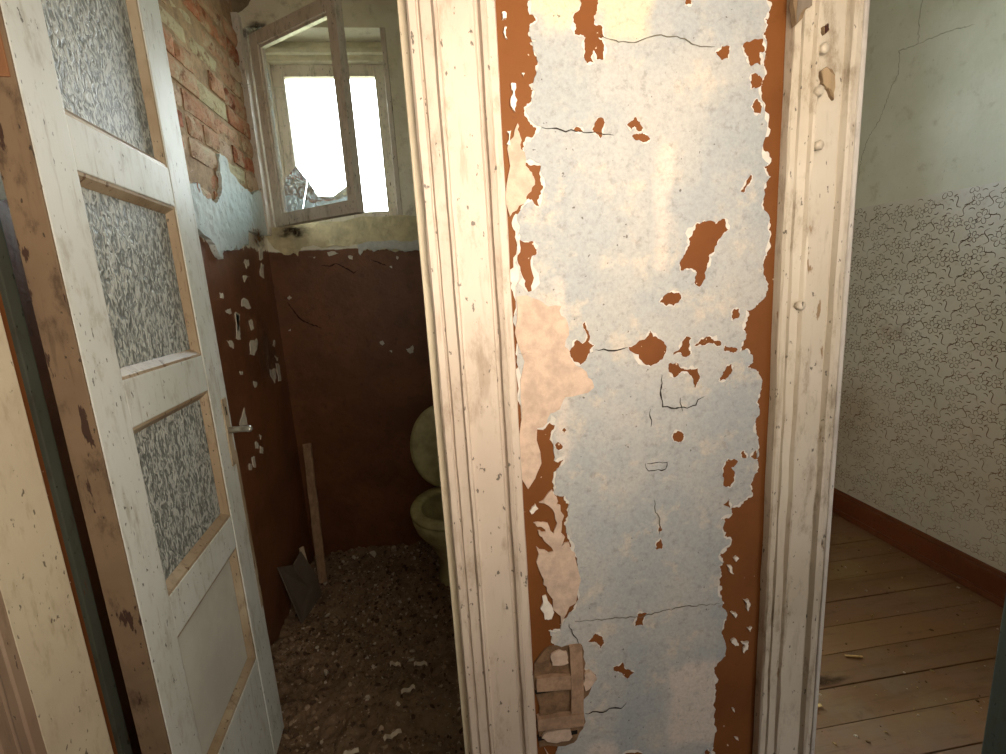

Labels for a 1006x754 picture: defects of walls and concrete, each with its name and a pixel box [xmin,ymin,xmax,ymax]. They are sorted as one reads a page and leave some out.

peeling [789,0,812,28]
crack [856,0,973,185]
spalling [158,0,419,282]
peeling [226,298,258,355]
peeling [269,340,281,383]
peeling [506,0,772,754]
peeling [249,434,263,470]